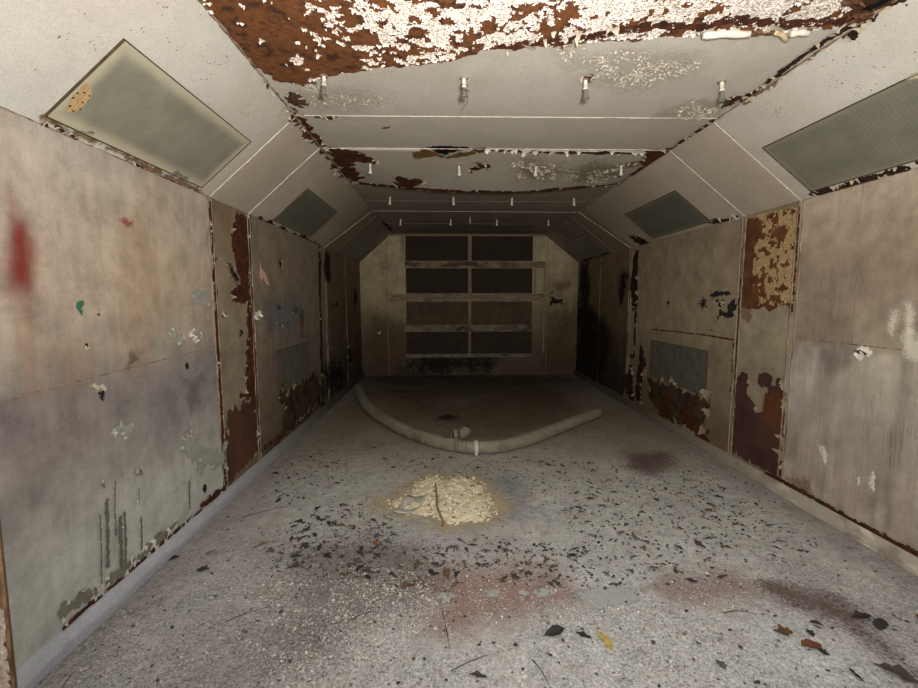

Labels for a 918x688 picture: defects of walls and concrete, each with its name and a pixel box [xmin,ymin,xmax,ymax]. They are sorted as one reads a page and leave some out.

peeling [201,0,875,179]
peeling [470,147,646,185]
peeling [708,207,798,320]
peeling [239,330,257,403]
peeling [732,372,788,477]
water stain [97,480,128,584]
peeling [856,471,876,492]